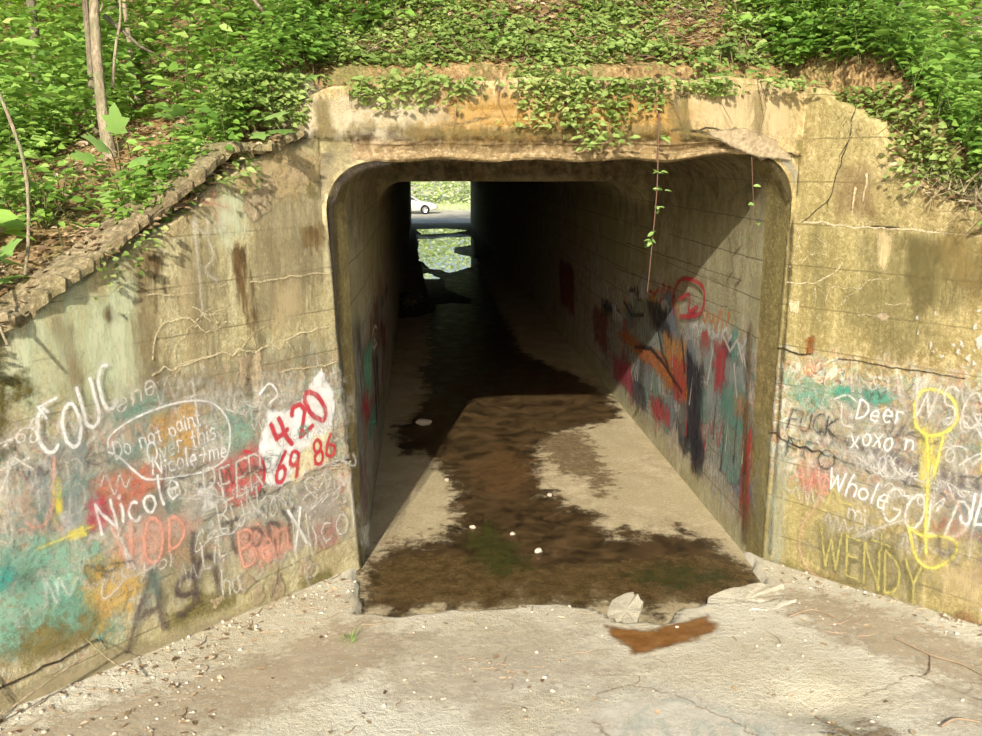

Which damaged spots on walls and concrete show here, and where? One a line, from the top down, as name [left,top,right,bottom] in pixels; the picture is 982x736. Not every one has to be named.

spalling [709,128,792,160]
crack [787,101,922,316]
rust [232,245,255,323]